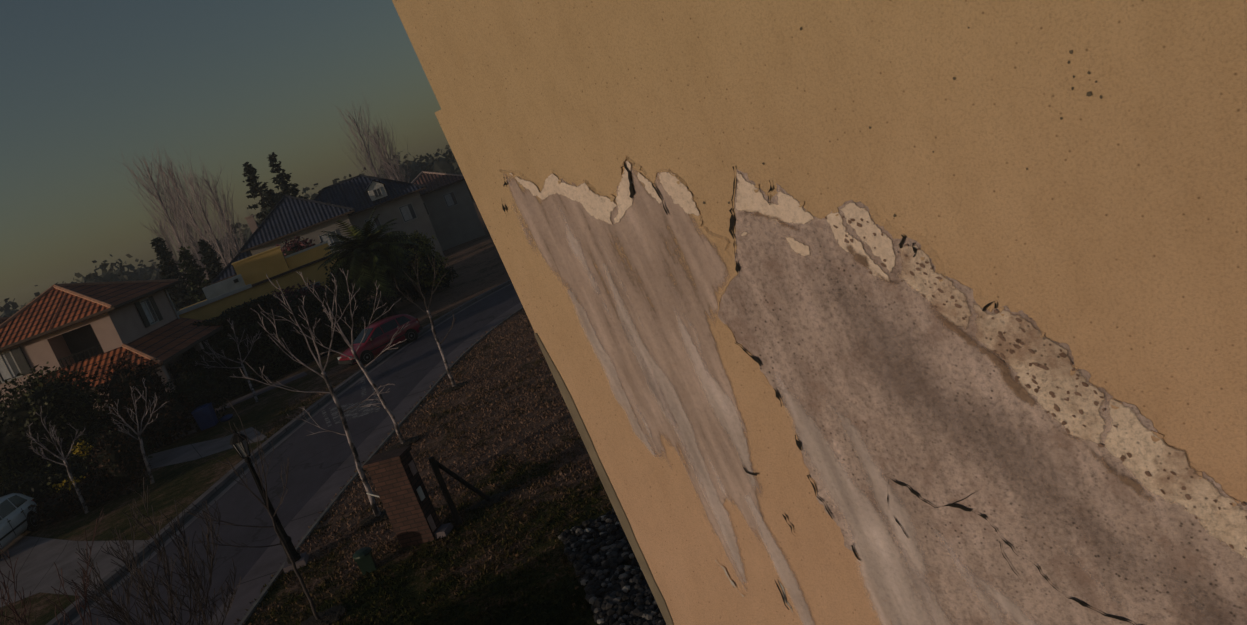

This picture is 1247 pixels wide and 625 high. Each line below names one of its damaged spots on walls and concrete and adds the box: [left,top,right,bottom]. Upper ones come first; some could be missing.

peeling [499,155,1247,625]
crack [887,478,1134,625]